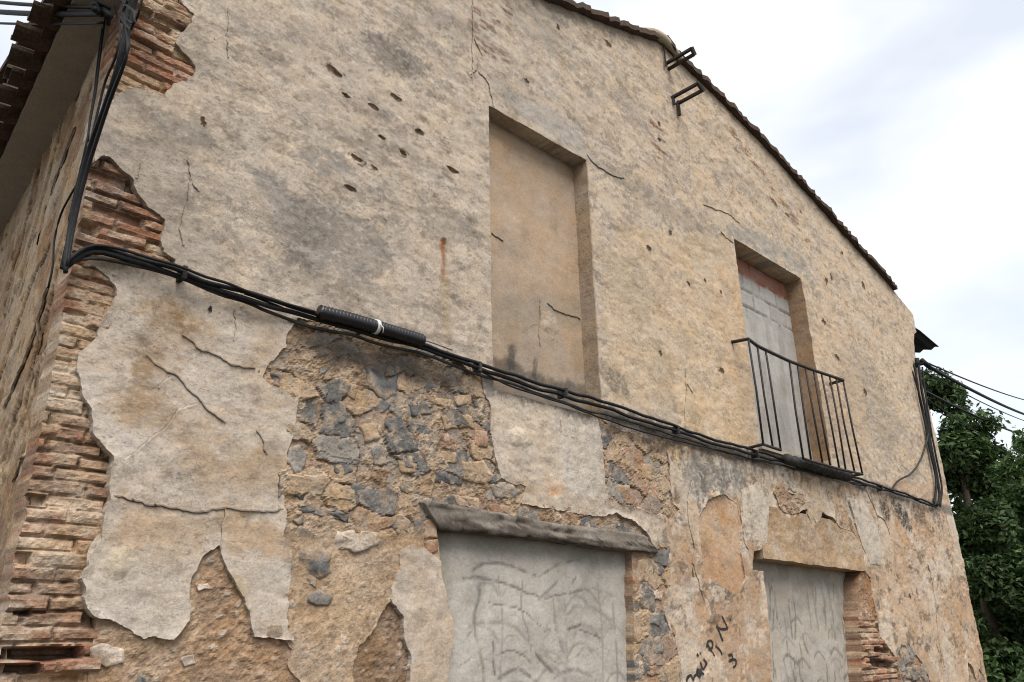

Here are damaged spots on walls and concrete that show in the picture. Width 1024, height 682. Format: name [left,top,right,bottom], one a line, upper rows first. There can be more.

flaking render [92,0,194,117]
crack [470,0,494,105]
crack [587,155,624,179]
crack [178,160,200,245]
crack [704,204,740,243]
crack [182,309,255,369]
crack [522,300,580,346]
damp [495,345,586,399]
crack [124,355,226,461]
crack [256,429,268,454]
flaking render [0,159,683,682]
crack [113,494,284,549]